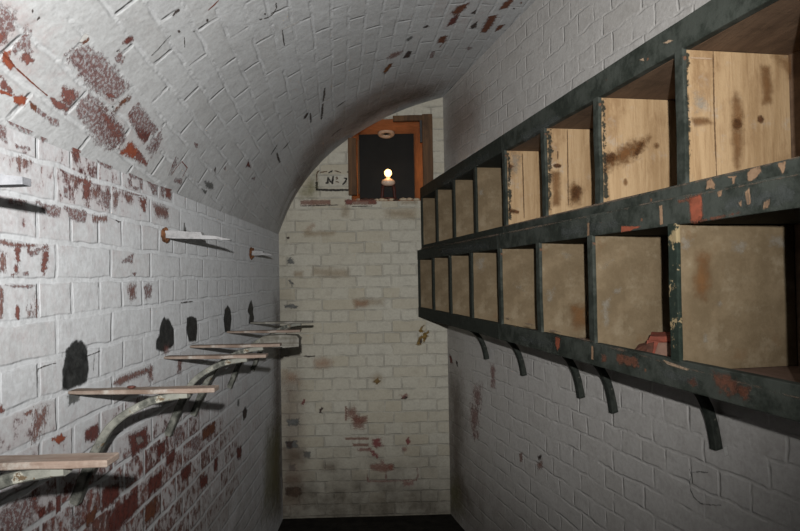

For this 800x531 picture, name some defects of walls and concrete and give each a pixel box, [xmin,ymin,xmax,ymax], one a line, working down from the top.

peeling [430,0,522,58]
peeling [0,4,162,172]
peeling [8,157,188,223]
peeling [0,239,49,319]
peeling [25,405,67,445]
peeling [85,423,99,442]
peeling [191,421,216,452]
peeling [345,406,371,451]
peeling [56,426,181,531]
peeling [181,462,191,483]
peeling [200,457,218,488]
peeling [1,496,46,531]